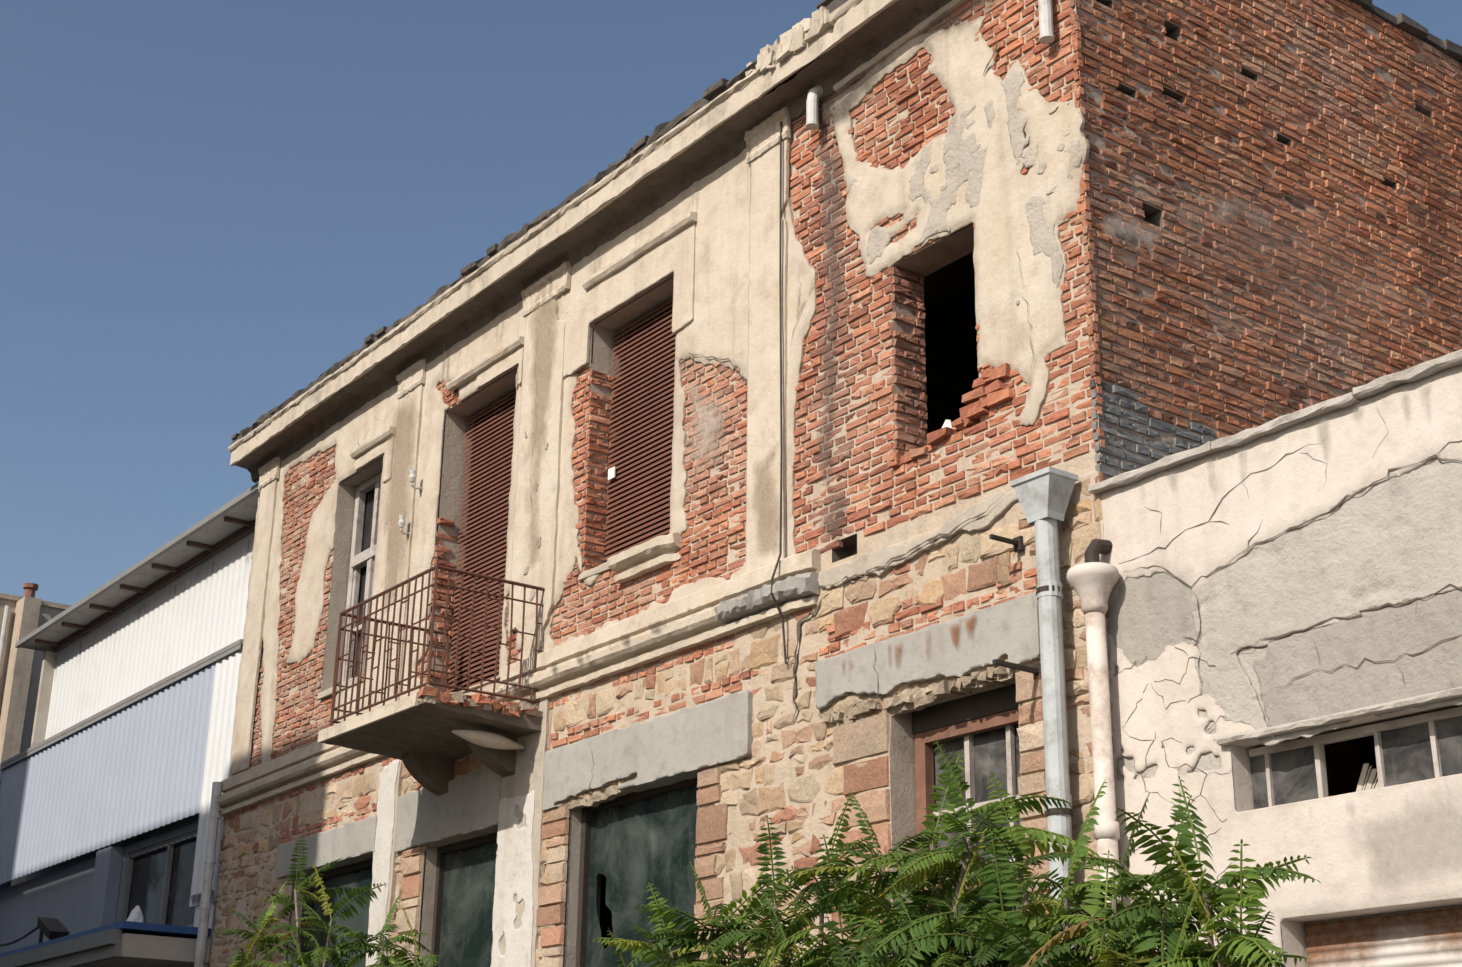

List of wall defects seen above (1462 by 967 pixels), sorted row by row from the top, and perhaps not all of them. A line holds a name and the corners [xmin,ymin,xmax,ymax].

spalling [740,6,838,98]
spalling [789,0,1105,563]
spalling [1116,83,1136,99]
spalling [1115,202,1163,247]
spalling [249,445,354,768]
spalling [550,345,747,645]
flaking render [1108,457,1462,746]
crack [1114,409,1462,882]